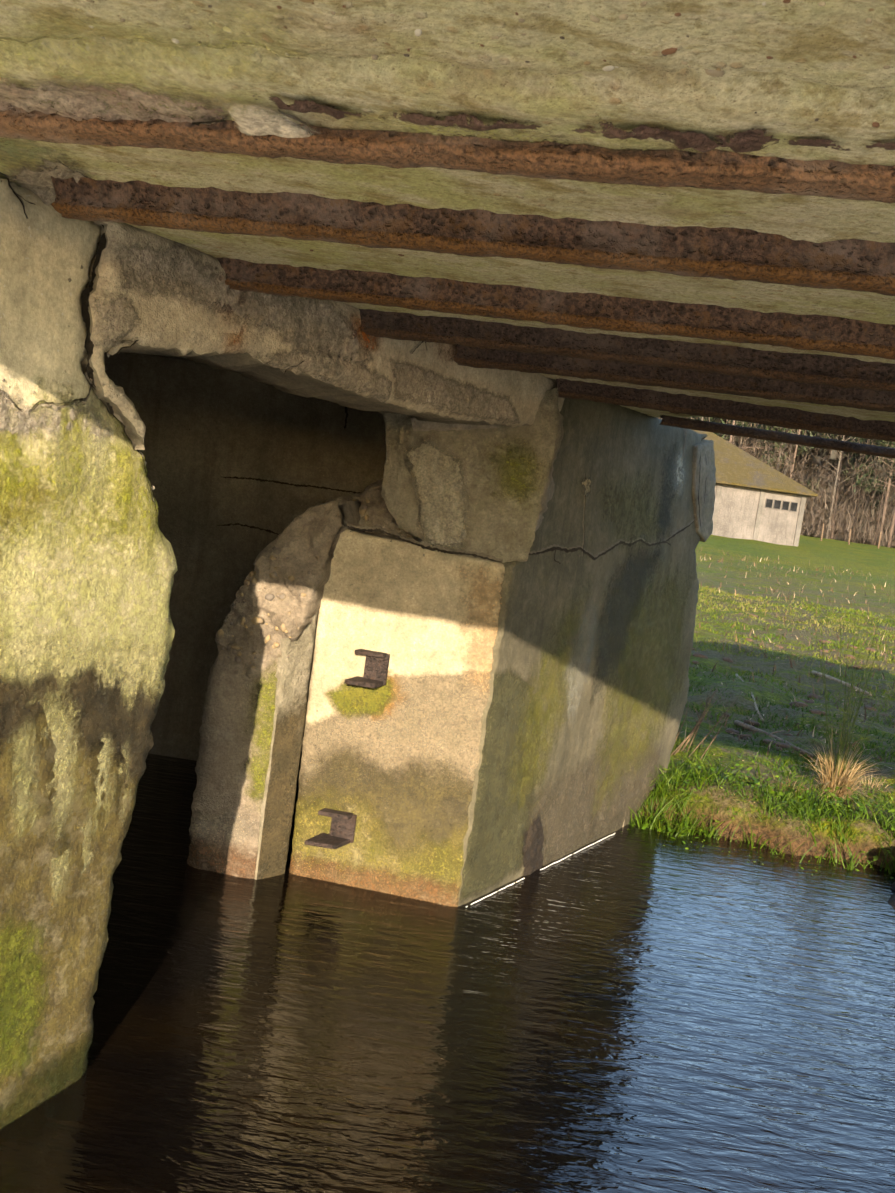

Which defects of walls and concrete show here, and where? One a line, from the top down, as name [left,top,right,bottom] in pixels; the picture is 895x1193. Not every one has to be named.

spalling [661,48,691,68]
spalling [0,81,540,138]
spalling [572,122,895,153]
spalling [9,150,96,205]
spalling [95,241,519,424]
crack [0,224,158,513]
spalling [0,392,108,437]
crack [223,476,360,493]
crack [347,452,707,564]
leakage [567,445,685,711]
leakage [0,632,170,1130]